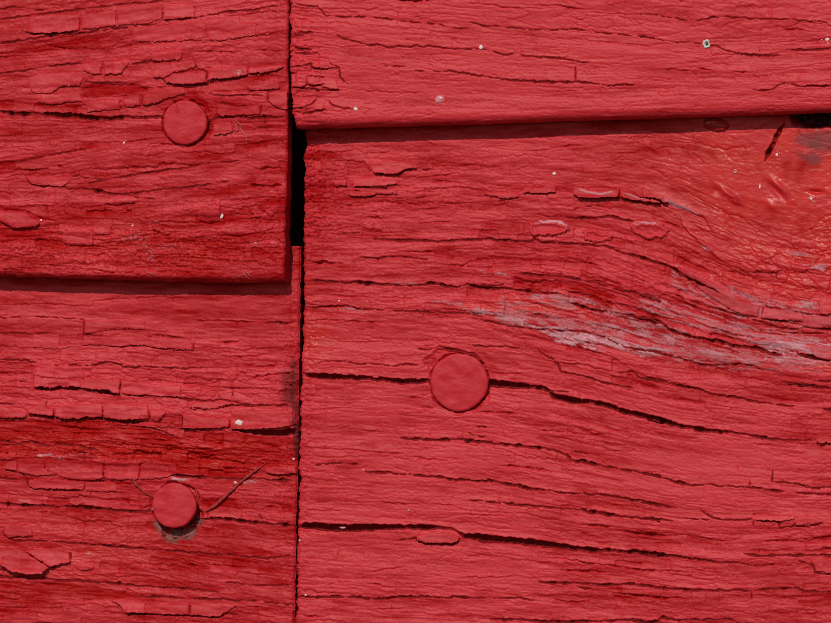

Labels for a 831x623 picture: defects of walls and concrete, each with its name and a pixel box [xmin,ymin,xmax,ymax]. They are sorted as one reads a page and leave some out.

peeling [29,4,339,135]
crack [0,0,831,133]
crack [302,232,831,443]
peeling [0,365,181,421]
crack [0,316,300,437]
peeling [183,402,298,430]
peeling [5,459,178,492]
crack [315,462,820,529]
crack [400,426,831,496]
peeling [0,548,94,575]
crack [0,513,831,623]
peeling [112,598,236,617]